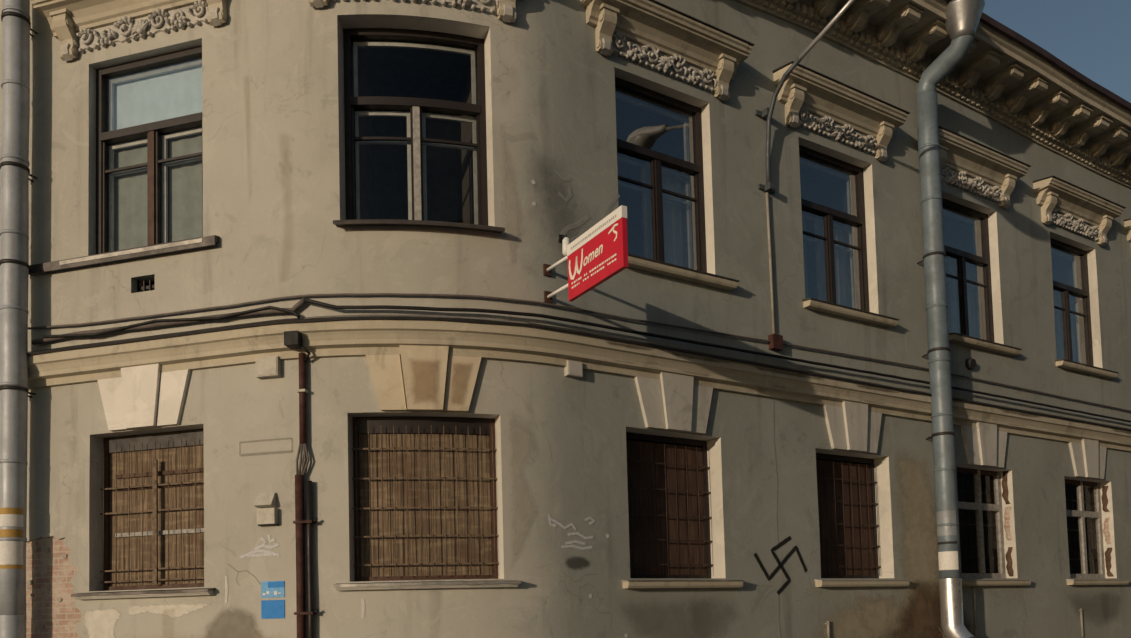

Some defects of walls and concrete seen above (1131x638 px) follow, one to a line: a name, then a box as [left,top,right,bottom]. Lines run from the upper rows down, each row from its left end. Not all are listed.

spalling [26,536,211,638]
water stain [206,612,260,638]